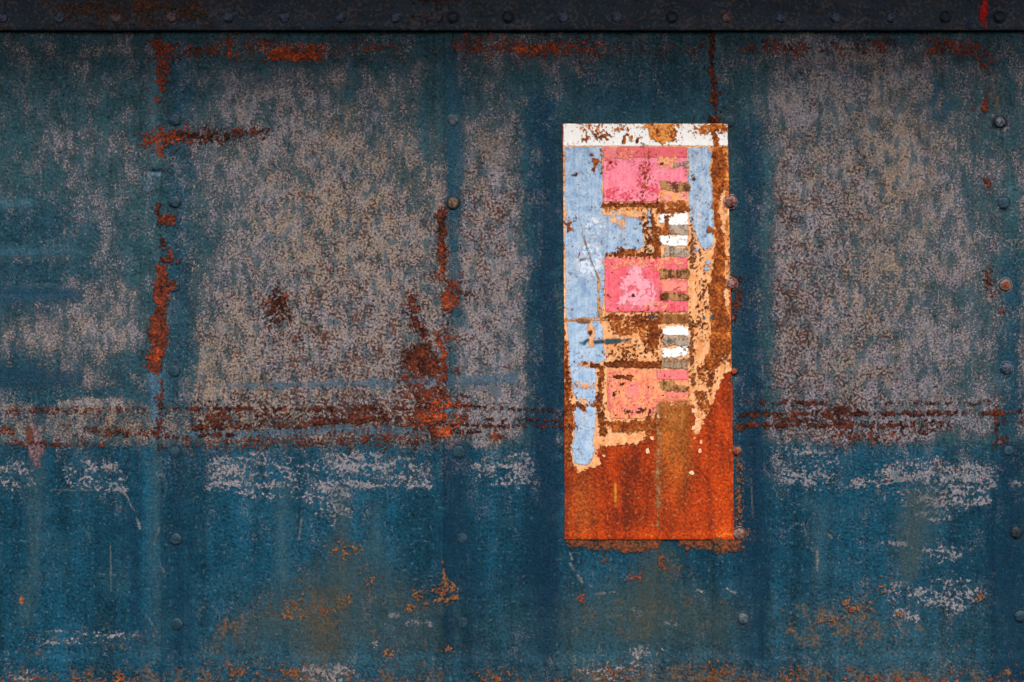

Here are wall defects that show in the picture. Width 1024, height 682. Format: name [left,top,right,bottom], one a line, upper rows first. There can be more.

corrosion [37,0,402,106]
corrosion [450,32,717,62]
corrosion [139,123,271,161]
peeling [0,32,670,526]
corrosion [0,202,666,471]
corrosion [734,397,1024,447]
corrosion [677,458,751,554]
corrosion [566,539,668,570]